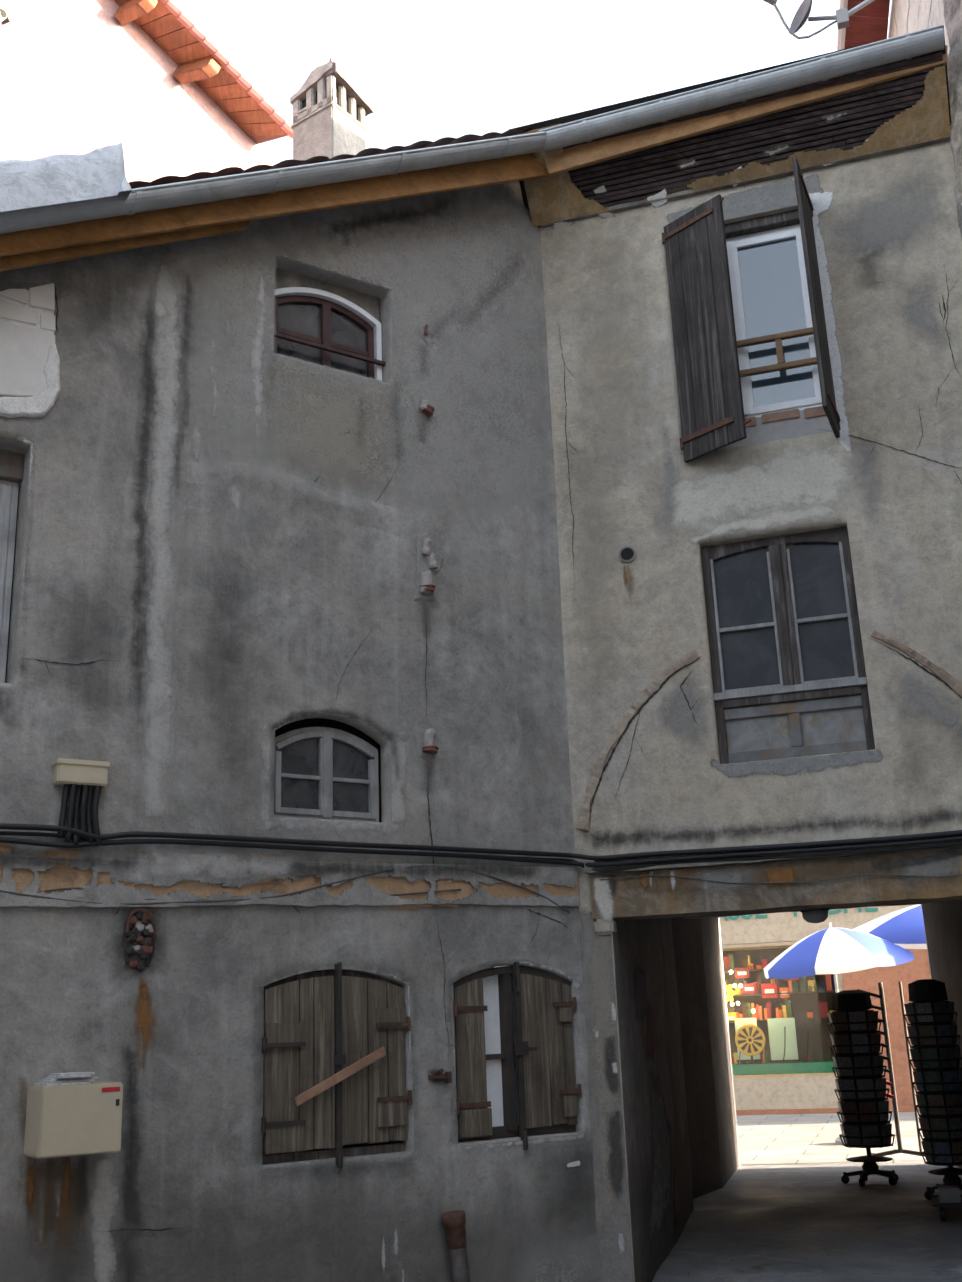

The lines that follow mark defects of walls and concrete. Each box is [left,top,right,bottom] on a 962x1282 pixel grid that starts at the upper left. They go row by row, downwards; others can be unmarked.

peeling [647,189,668,208]
leakage [252,276,266,435]
crack [819,269,962,484]
leakage [133,265,191,817]
crack [422,617,430,723]
crack [427,772,440,864]
crack [588,657,701,833]
rust [136,980,154,1044]
peeling [0,843,623,1205]
leakage [91,1050,140,1282]
leakage [382,1230,398,1269]